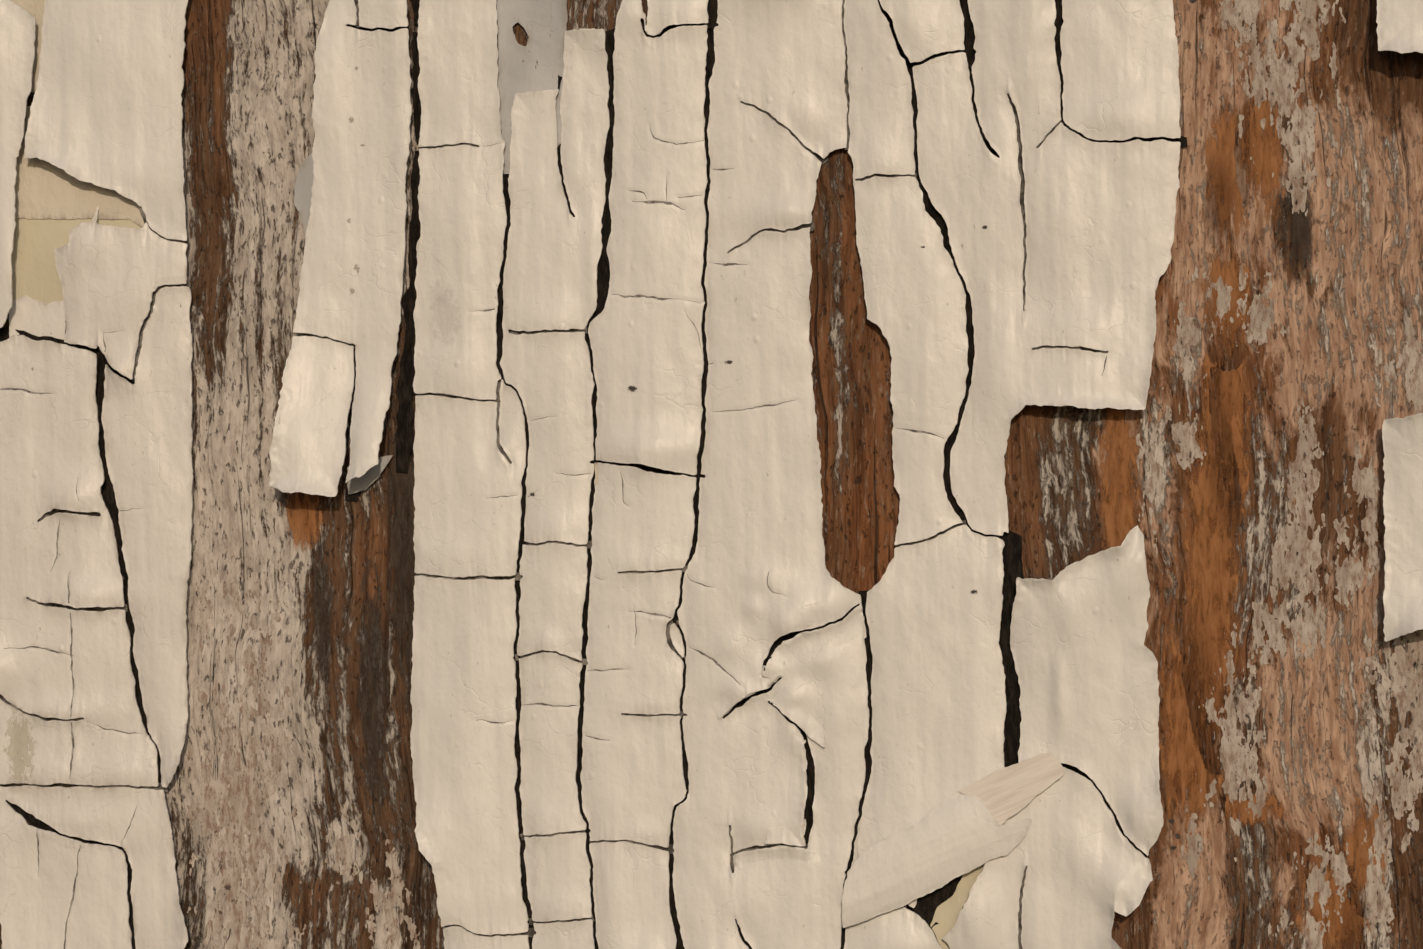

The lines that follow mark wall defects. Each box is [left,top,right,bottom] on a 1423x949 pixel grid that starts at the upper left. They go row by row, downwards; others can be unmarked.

crack [0,282,191,949]
crack [139,207,189,245]
crack [298,333,356,429]
crack [345,486,360,501]
peeling [0,0,709,949]
crack [348,0,1187,949]
peeling [670,0,1423,949]